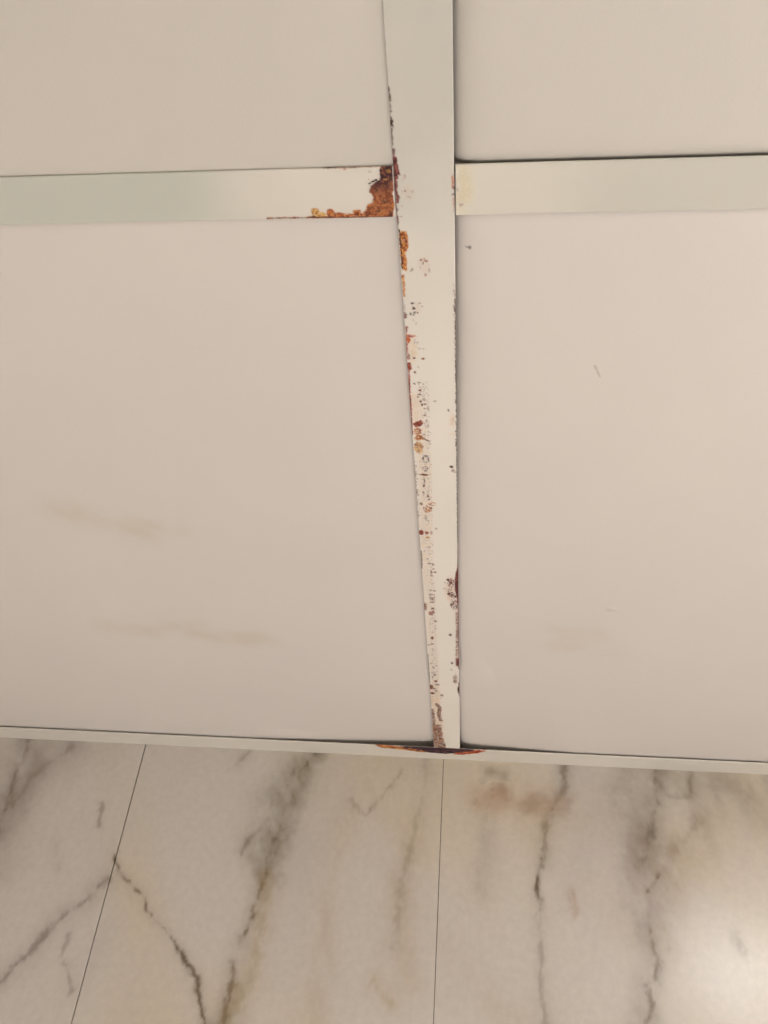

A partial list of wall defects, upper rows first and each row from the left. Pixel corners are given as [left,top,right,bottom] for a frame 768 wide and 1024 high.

rust [266,85,487,755]